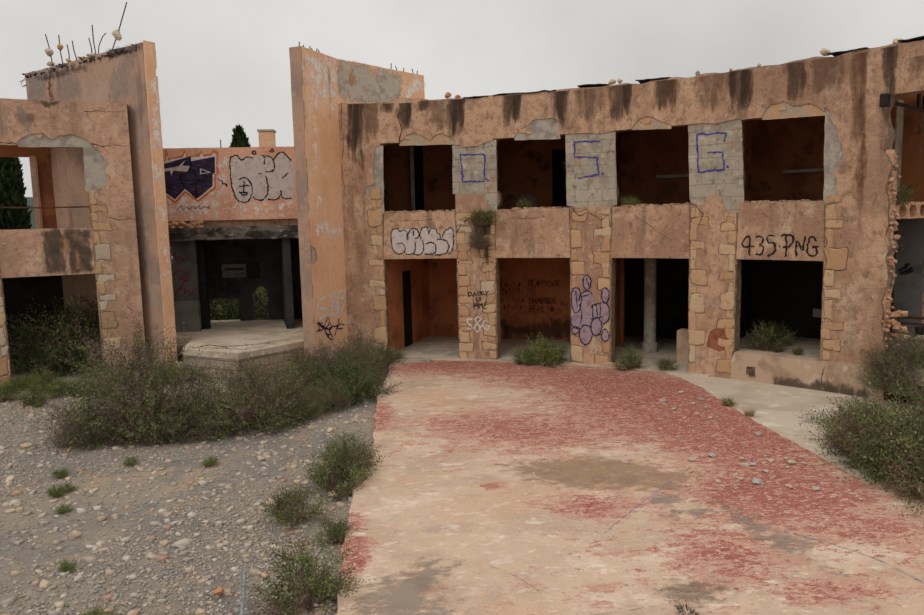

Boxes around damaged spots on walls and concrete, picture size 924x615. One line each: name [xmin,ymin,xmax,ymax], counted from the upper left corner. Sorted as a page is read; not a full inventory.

flaking render [299,42,426,169]
damp [380,100,428,127]
damp [449,99,464,134]
damp [503,95,520,125]
damp [554,90,568,121]
damp [610,84,631,119]
damp [656,79,675,109]
damp [730,69,753,107]
damp [787,61,806,96]
damp [347,104,364,167]
flaking render [17,133,107,193]
flaking render [514,118,617,208]